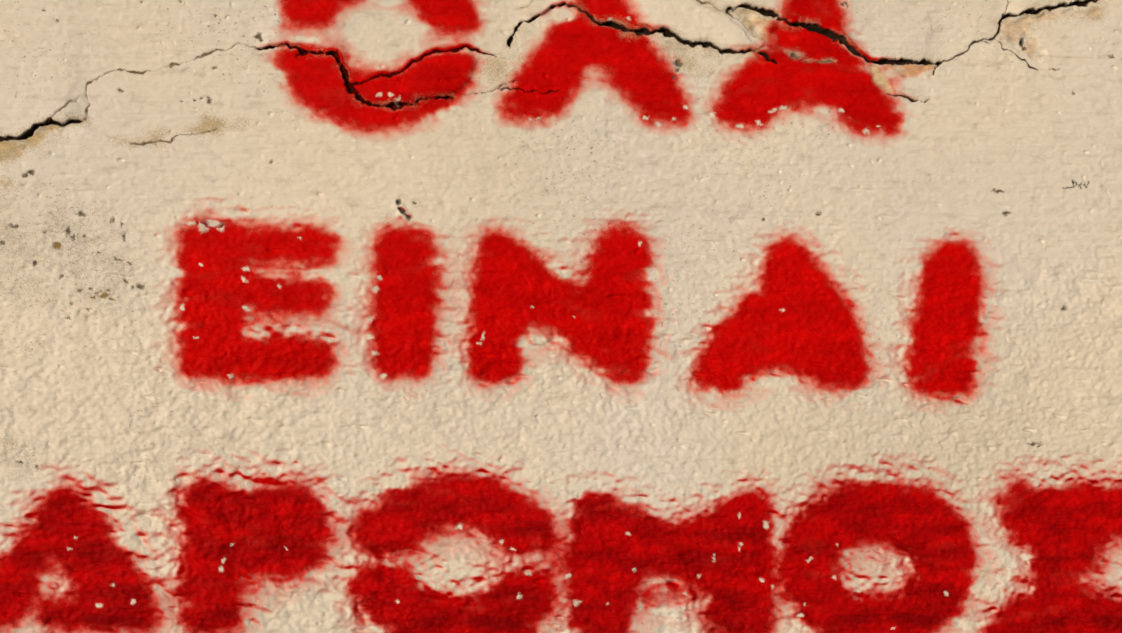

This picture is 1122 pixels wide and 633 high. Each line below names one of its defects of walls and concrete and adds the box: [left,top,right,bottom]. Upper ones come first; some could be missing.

crack [0,0,1097,147]